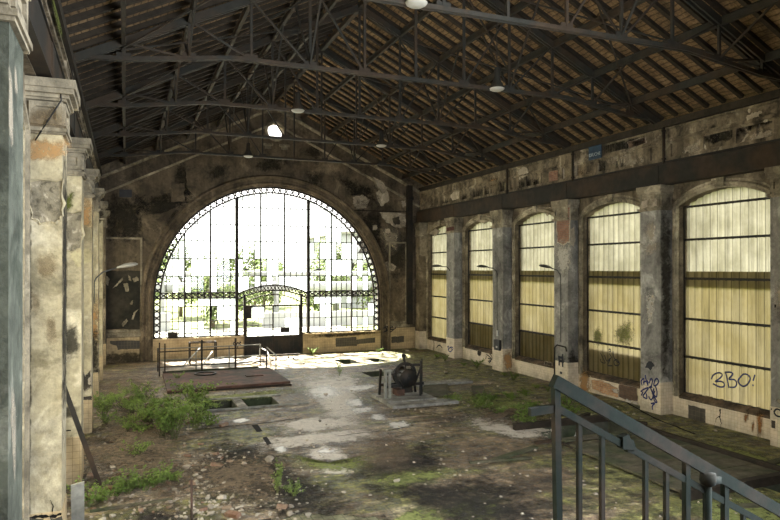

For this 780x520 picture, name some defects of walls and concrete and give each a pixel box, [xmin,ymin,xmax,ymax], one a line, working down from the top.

flaking render [546,206,576,248]
leakage [66,326,78,354]
peeling [83,369,93,400]
corrosion [744,414,762,437]